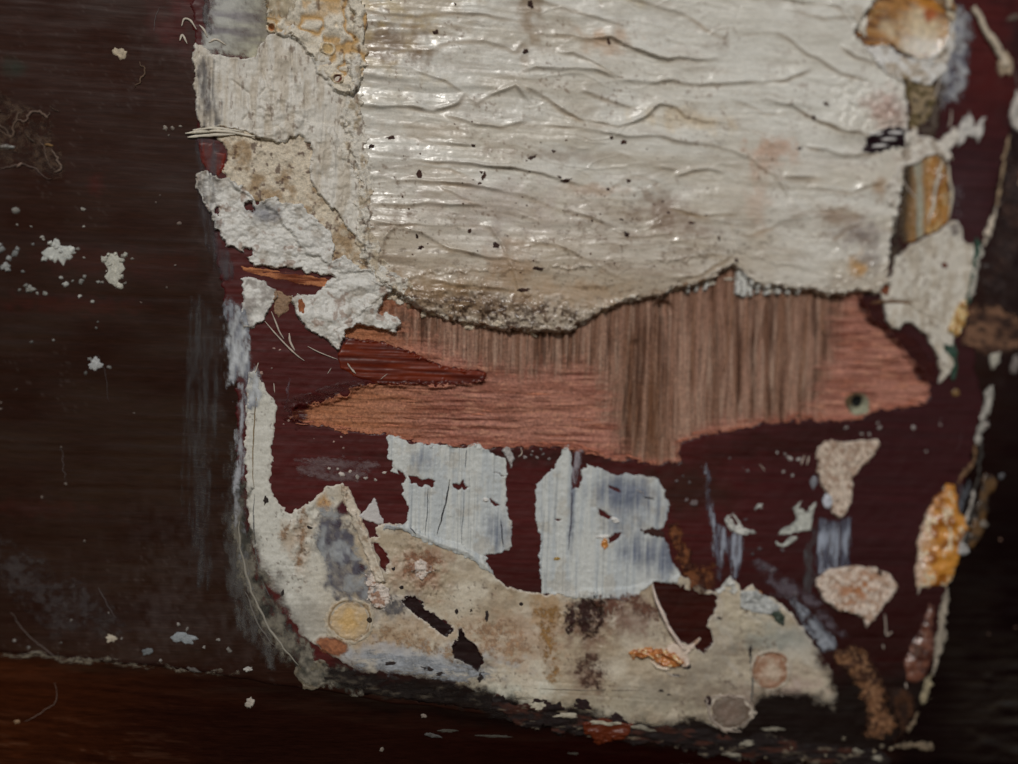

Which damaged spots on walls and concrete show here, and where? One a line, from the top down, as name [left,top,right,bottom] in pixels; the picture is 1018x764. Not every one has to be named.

peeling [501,446,515,468]
peeling [775,439,880,548]
peeling [359,498,384,525]
peeling [725,513,756,536]
peeling [715,576,785,626]
peeling [628,585,701,671]
peeling [513,691,577,719]
peeling [424,729,458,738]
peeling [590,720,656,732]